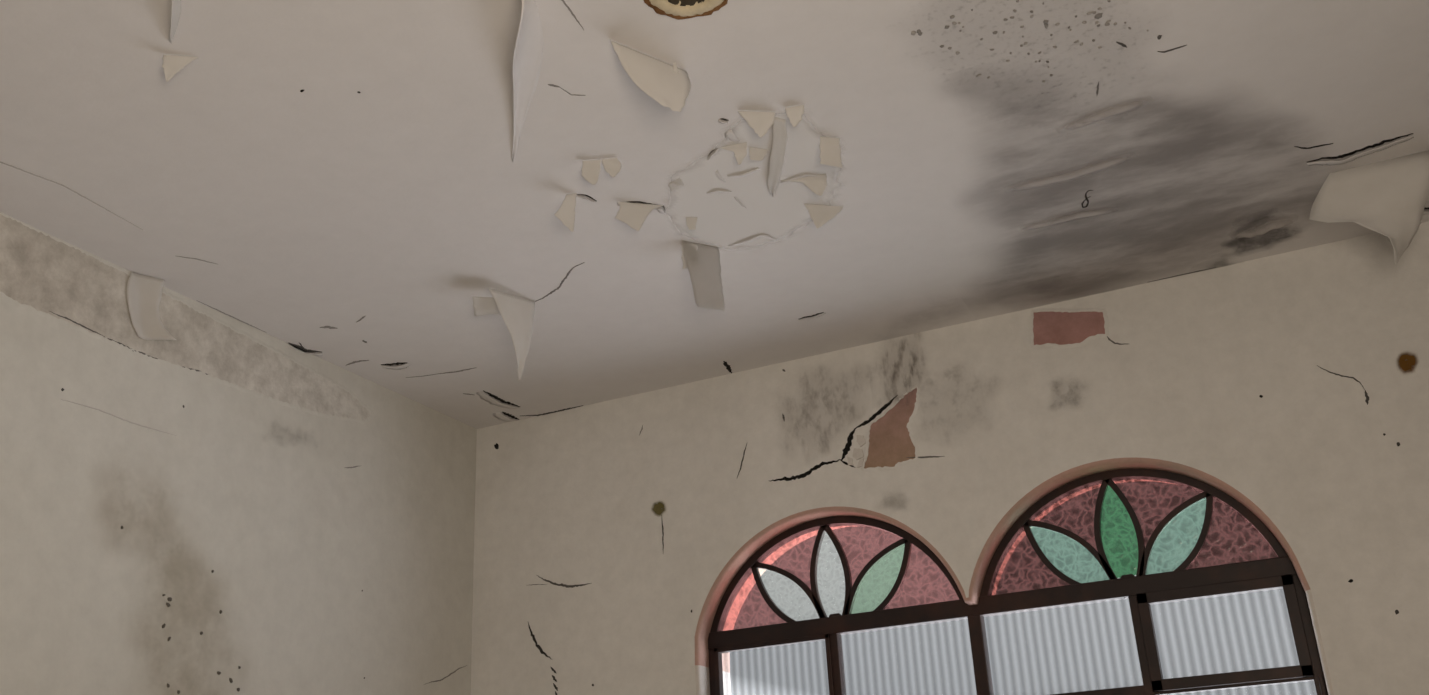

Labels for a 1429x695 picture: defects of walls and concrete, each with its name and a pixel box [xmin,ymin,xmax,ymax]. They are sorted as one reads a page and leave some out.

peeling [512,0,543,162]
peeling [610,40,691,112]
leakage [980,0,1149,83]
crack [1294,133,1414,166]
peeling [681,240,725,311]
flaking render [0,213,374,424]
peeling [472,288,535,380]
flaking render [1029,308,1109,349]
rust [1398,353,1417,372]
crack [771,396,897,481]
flaking render [847,384,921,472]